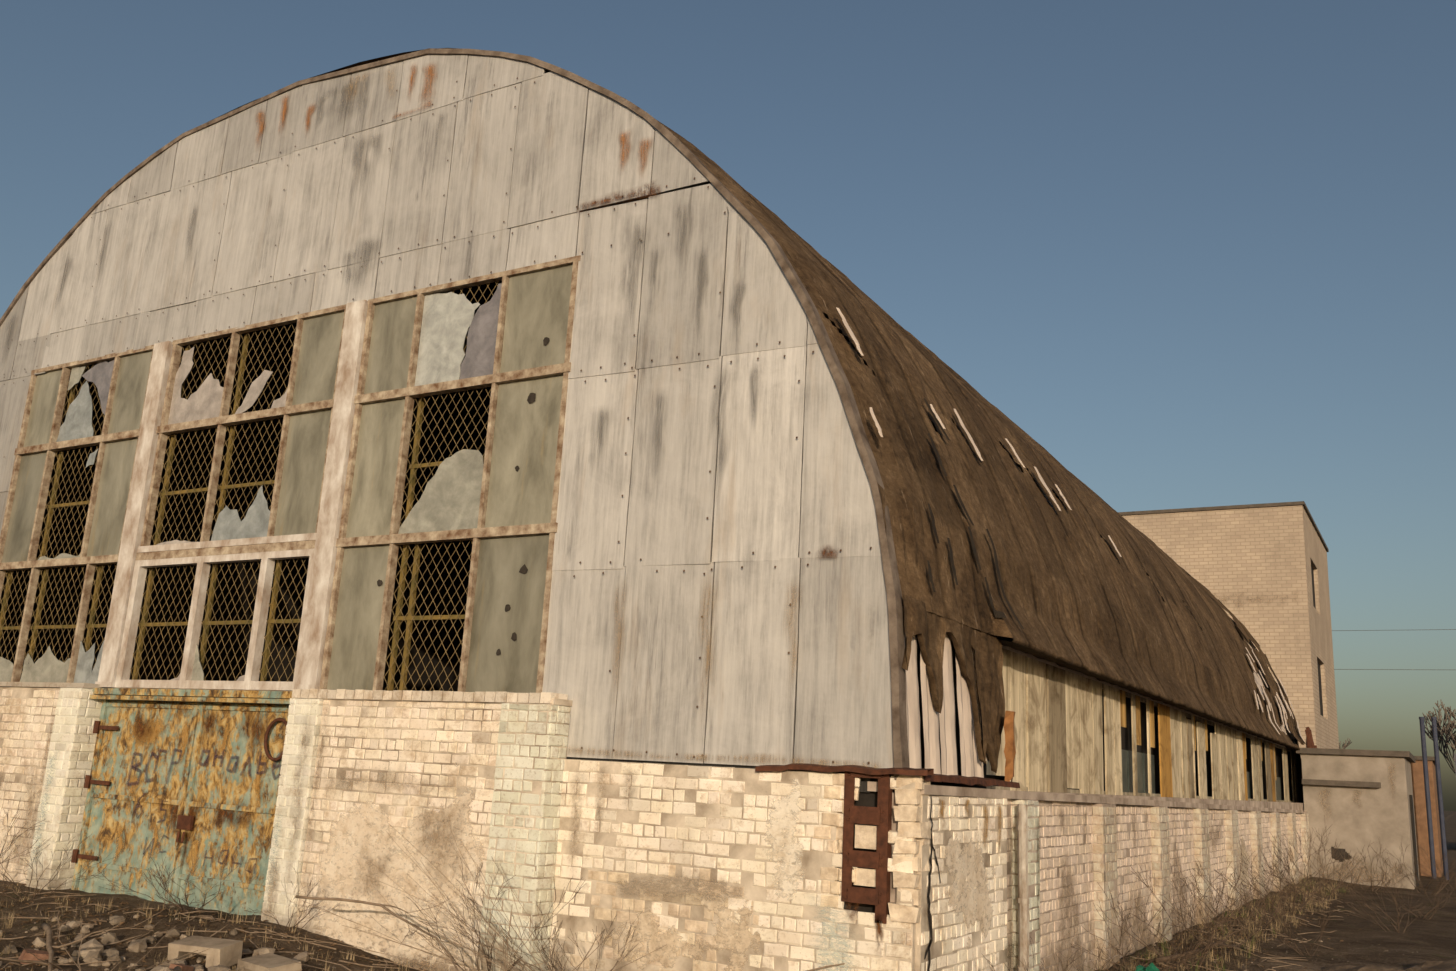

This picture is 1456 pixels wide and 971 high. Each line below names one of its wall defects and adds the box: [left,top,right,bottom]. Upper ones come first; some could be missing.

rust [410,66,435,104]
rust [620,134,649,166]
rust [132,719,162,743]
rust [180,717,262,758]
rust [218,757,266,823]
rust [152,804,199,876]
crack [924,796,941,971]